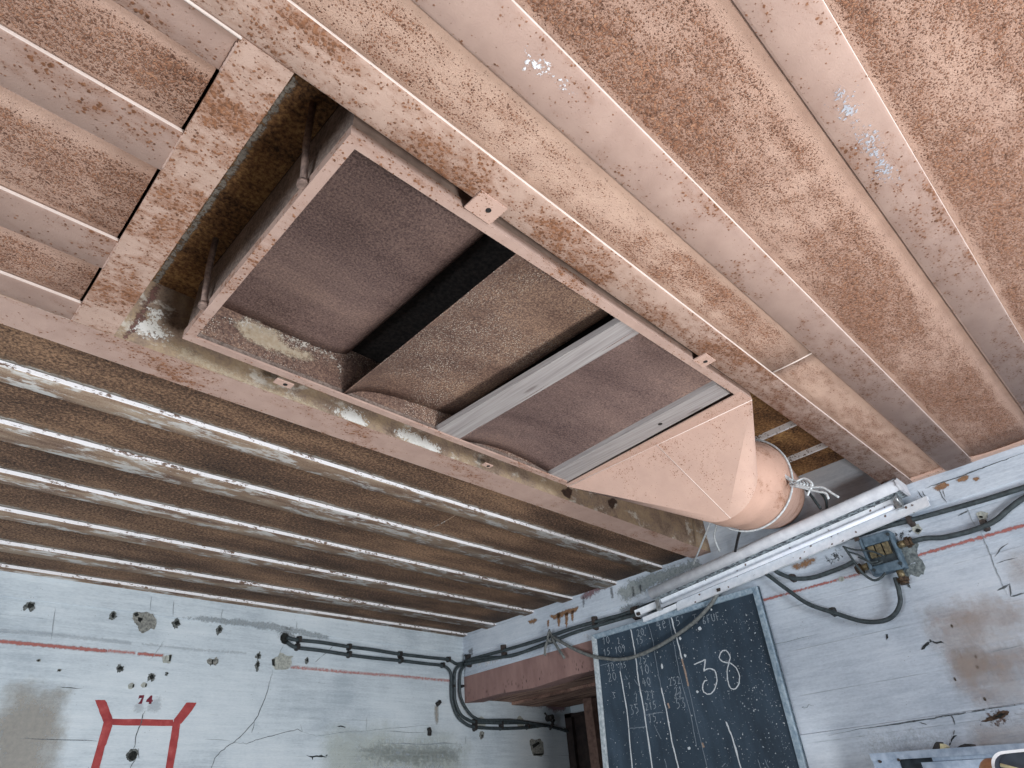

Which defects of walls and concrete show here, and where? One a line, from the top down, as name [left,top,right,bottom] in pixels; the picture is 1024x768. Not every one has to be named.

peeling [329,405,370,427]
crack [919,454,1024,597]
peeling [901,524,925,577]
corrosion [793,558,815,570]
spalling [132,612,157,633]
corrosion [528,607,578,628]
crack [209,675,466,768]